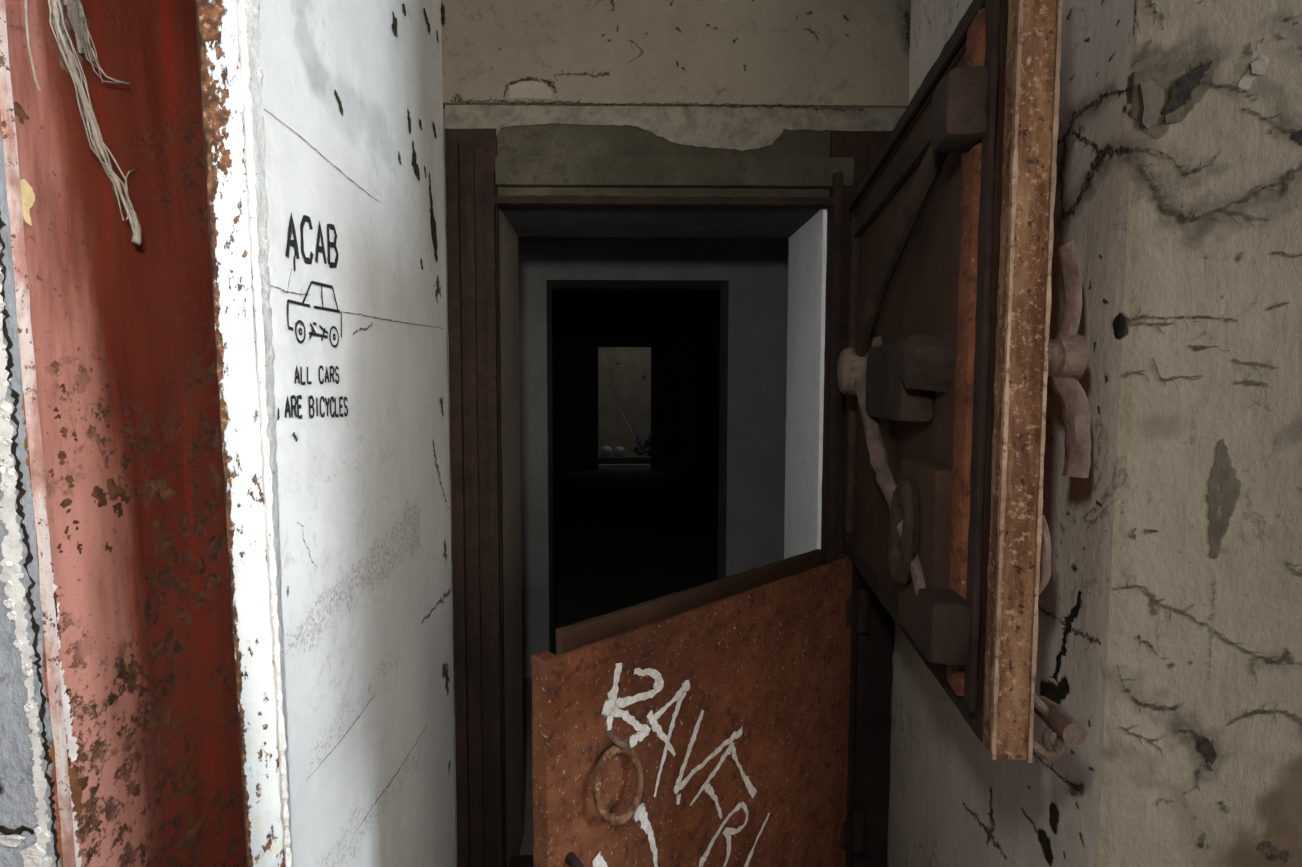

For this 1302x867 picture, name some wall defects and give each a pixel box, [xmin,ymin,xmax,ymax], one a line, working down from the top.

flaking render [398,69,906,303]
crack [1057,0,1302,260]
flaking render [1122,16,1299,138]
crack [1112,307,1278,398]
corrosion [21,391,32,487]
corrosion [48,407,83,573]
corrosion [91,478,131,517]
damp [1207,439,1242,559]
flaking render [0,268,53,867]
flaking render [442,662,450,694]
crack [963,511,1302,867]
corrosion [48,739,89,867]